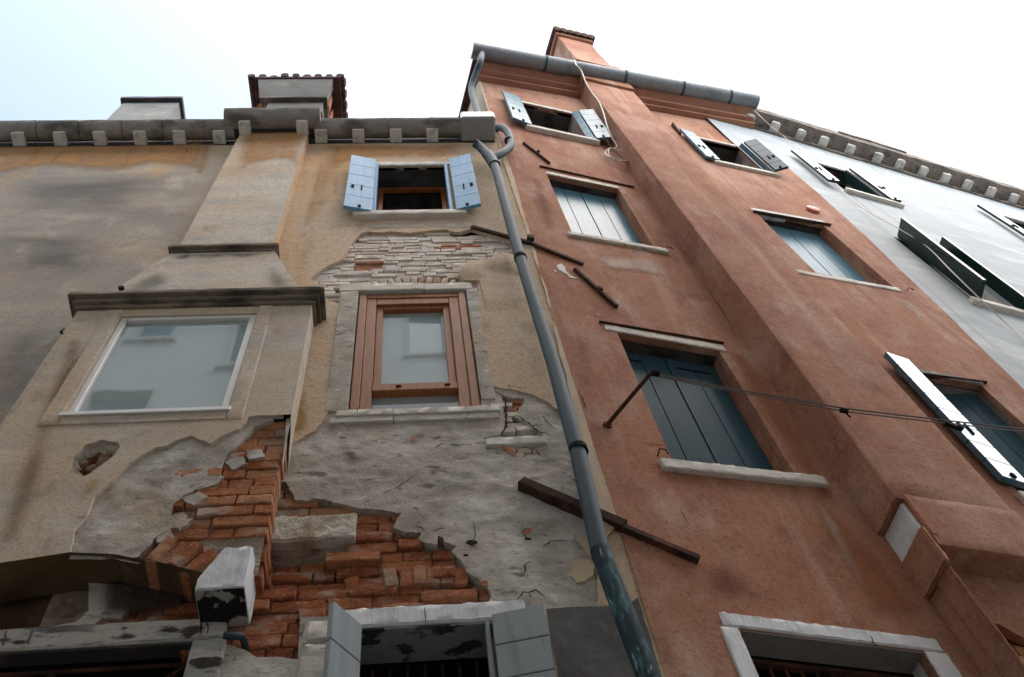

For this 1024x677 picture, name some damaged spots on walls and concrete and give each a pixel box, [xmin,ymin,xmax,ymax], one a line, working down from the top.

peeling [313,232,513,304]
crack [435,385,555,448]
peeling [39,388,598,677]